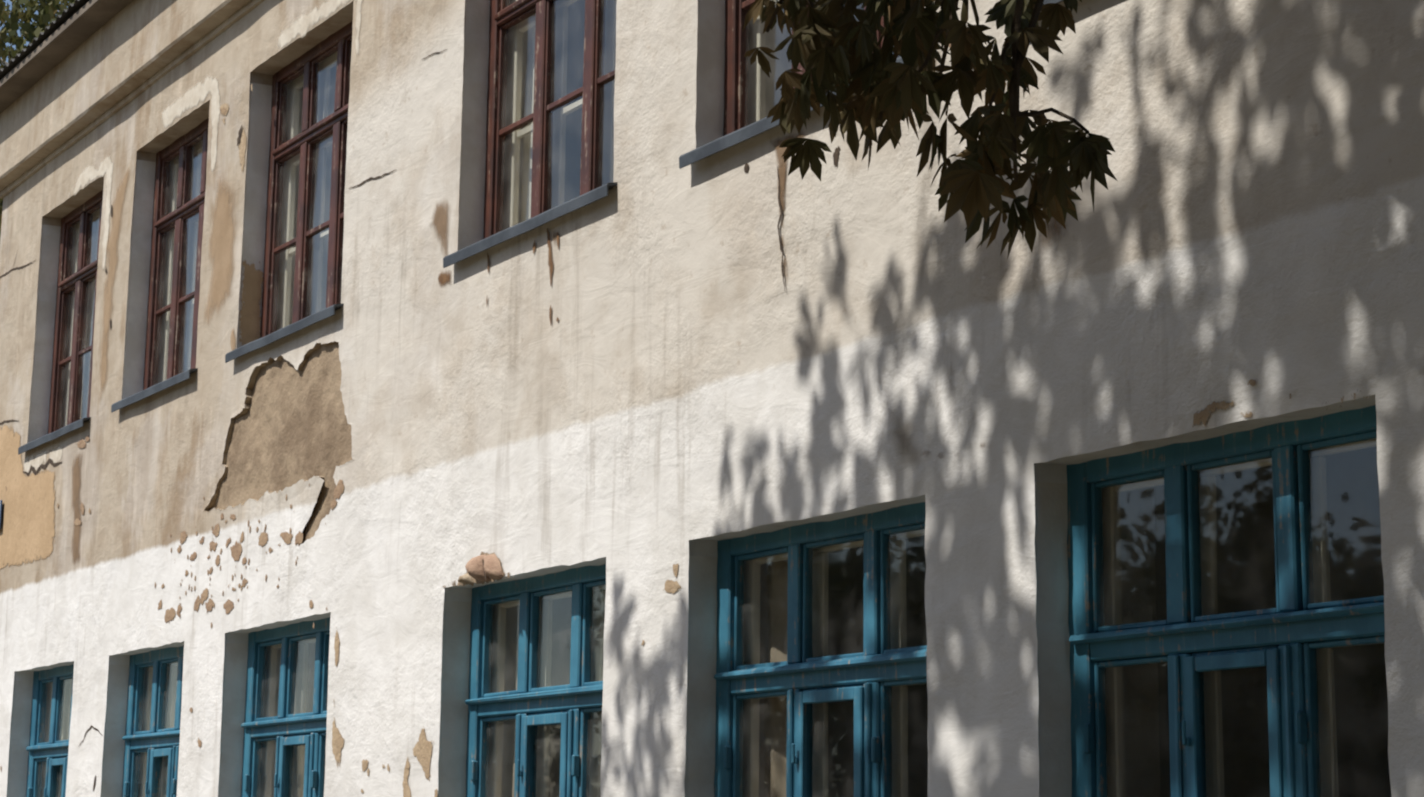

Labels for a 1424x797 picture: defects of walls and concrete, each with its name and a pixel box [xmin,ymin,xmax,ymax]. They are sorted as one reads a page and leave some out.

rust [774,133,802,246]
spalling [155,182,356,630]
peeling [663,564,681,594]
peeling [332,704,344,768]
peeling [361,729,438,797]